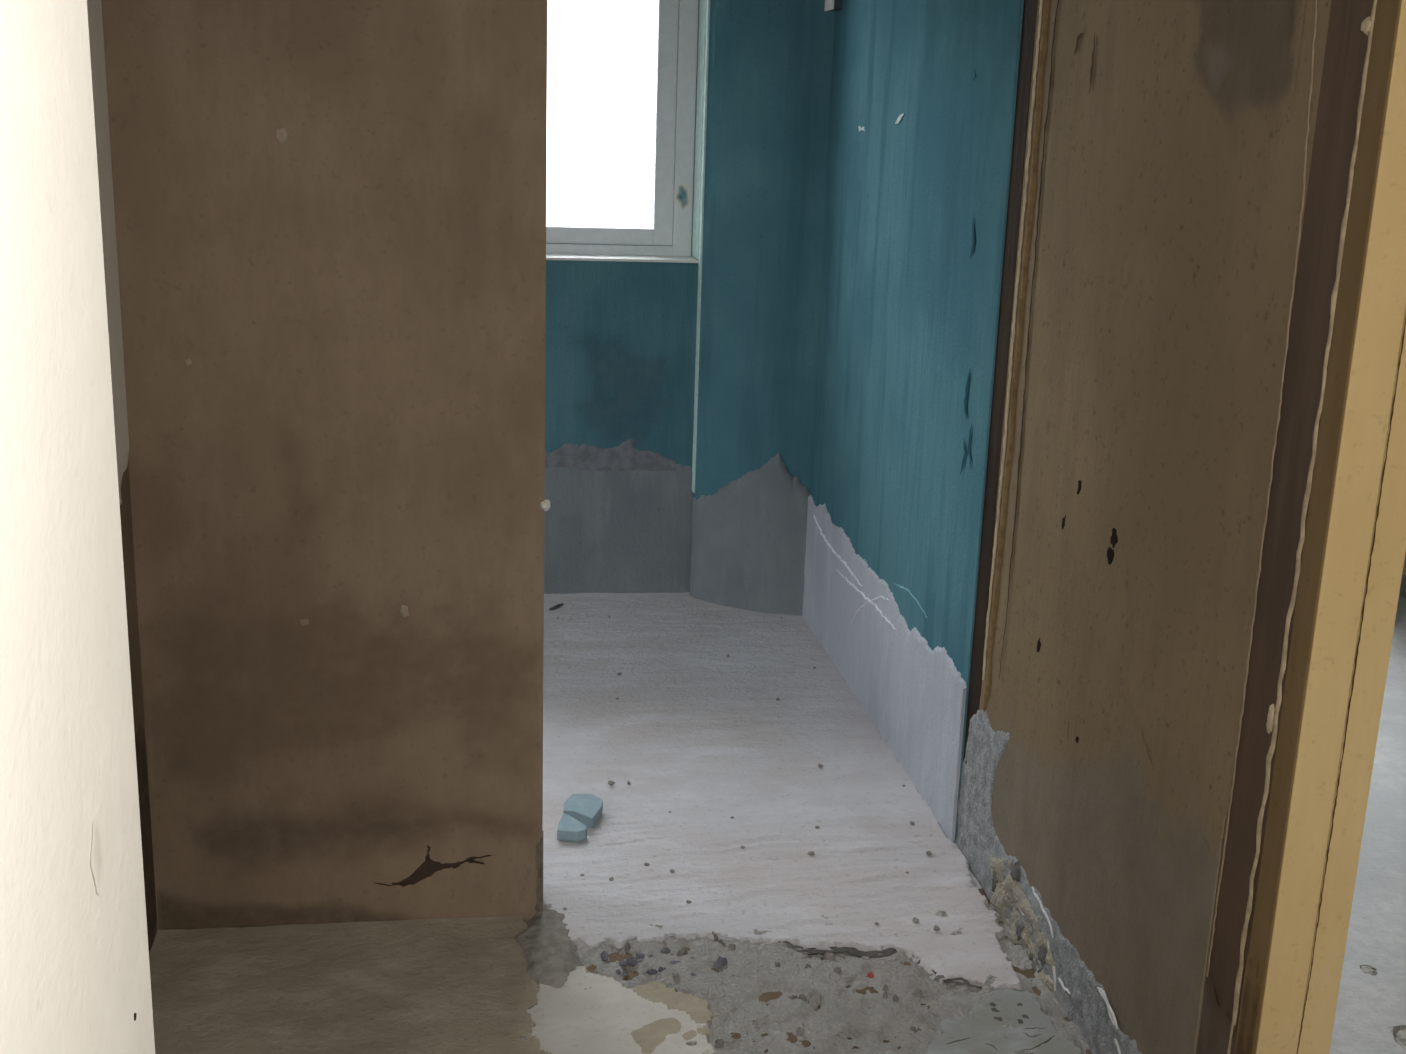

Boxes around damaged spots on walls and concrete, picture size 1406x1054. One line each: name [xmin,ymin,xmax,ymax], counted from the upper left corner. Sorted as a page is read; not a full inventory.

leakage [1185,0,1306,134]
spalling [574,855,1090,1054]